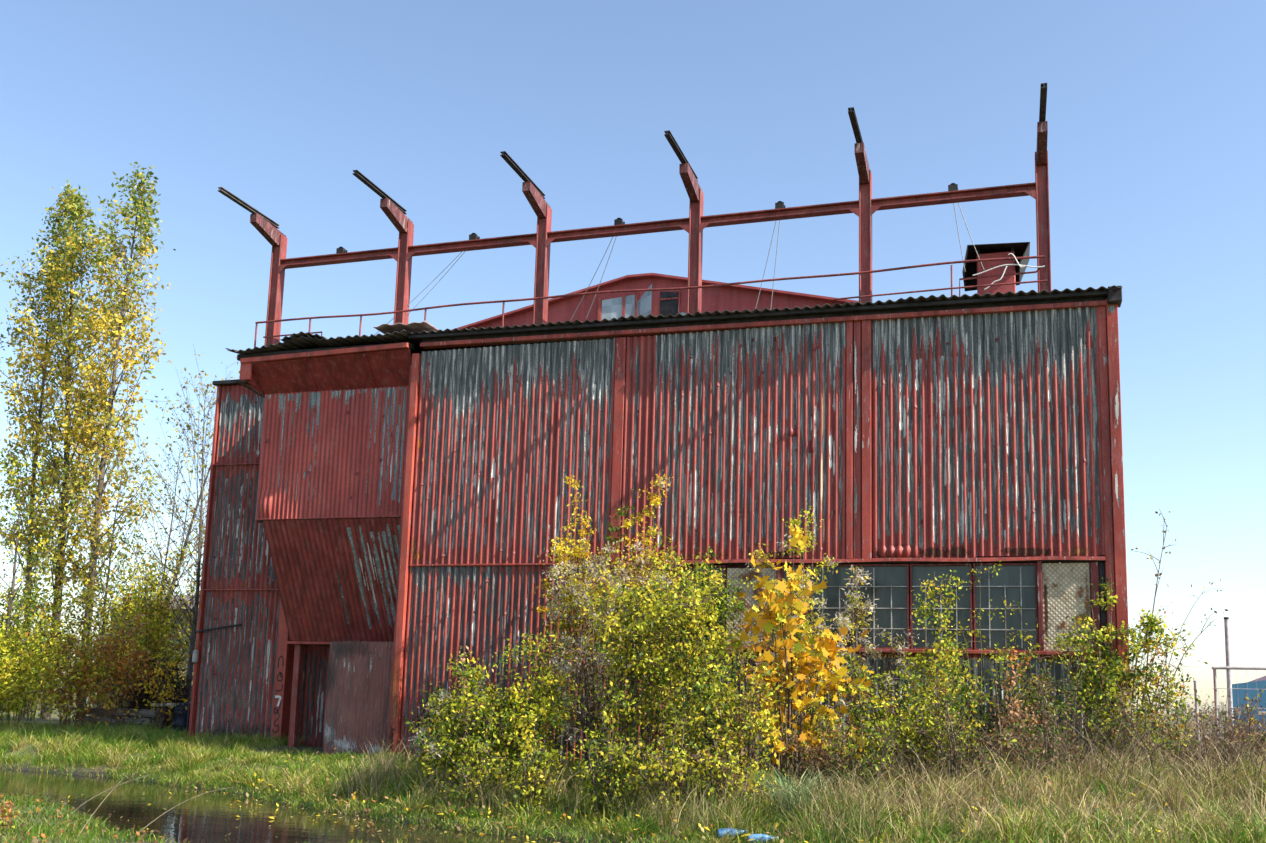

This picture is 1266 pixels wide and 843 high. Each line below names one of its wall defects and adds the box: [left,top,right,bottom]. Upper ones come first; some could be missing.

peeling [196,387,406,747]
peeling [346,338,660,763]
peeling [652,305,1114,553]